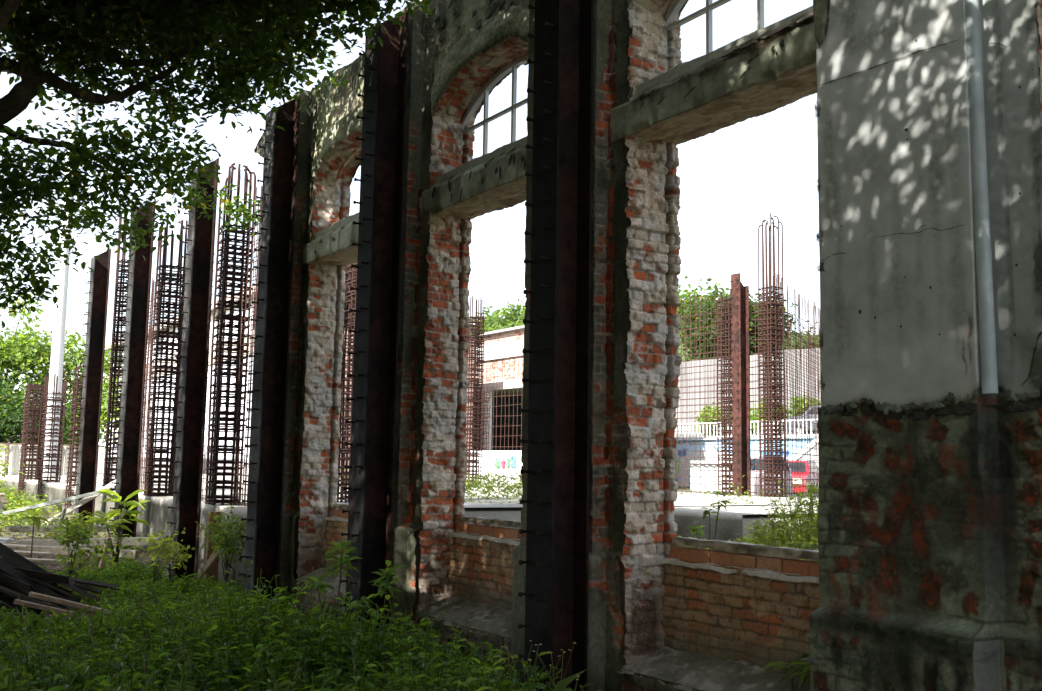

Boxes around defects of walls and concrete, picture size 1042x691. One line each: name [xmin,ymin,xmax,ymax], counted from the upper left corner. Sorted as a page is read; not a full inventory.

crack [821,40,958,85]
spalling [416,147,526,234]
crack [880,224,966,237]
spalling [821,332,1042,615]
spalling [1018,569,1042,625]